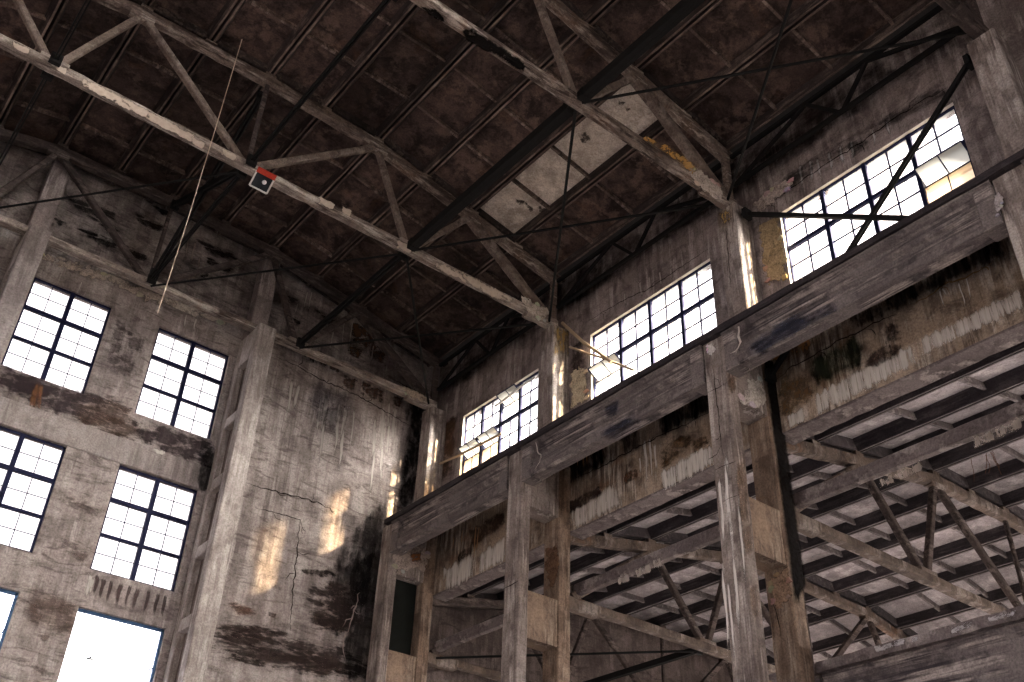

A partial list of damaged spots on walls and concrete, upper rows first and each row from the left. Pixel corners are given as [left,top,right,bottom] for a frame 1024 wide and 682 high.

peeling [82,79,205,149]
peeling [319,197,351,217]
peeling [753,177,794,285]
peeling [436,263,549,322]
leakage [779,291,1022,427]
leakage [0,366,211,464]
leakage [570,485,622,528]
leakage [621,431,713,489]
crack [248,483,335,629]
leakage [212,569,366,678]